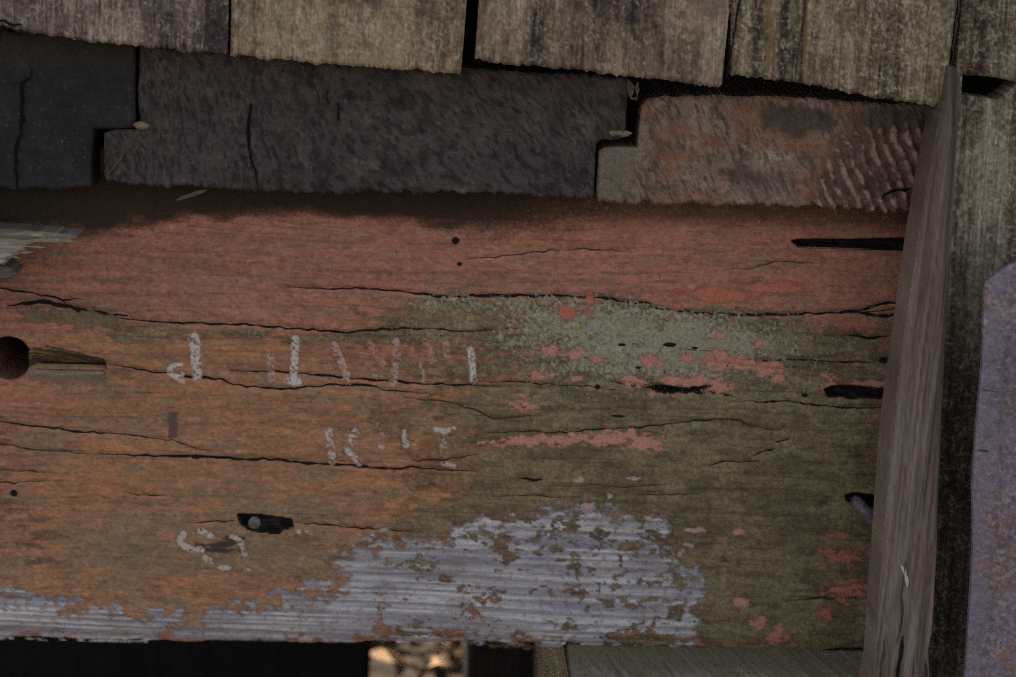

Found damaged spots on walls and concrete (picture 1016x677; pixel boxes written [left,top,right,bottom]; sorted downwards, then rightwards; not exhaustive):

crack [14,70,32,191]
crack [0,288,565,333]
crack [287,286,896,372]
crack [0,421,477,484]
crack [106,363,881,466]
peeling [477,428,684,452]
peeling [617,333,788,398]
peeling [851,379,885,387]
crack [491,477,697,499]
peeling [0,493,706,647]
peeling [812,531,870,622]
peeling [747,615,790,648]